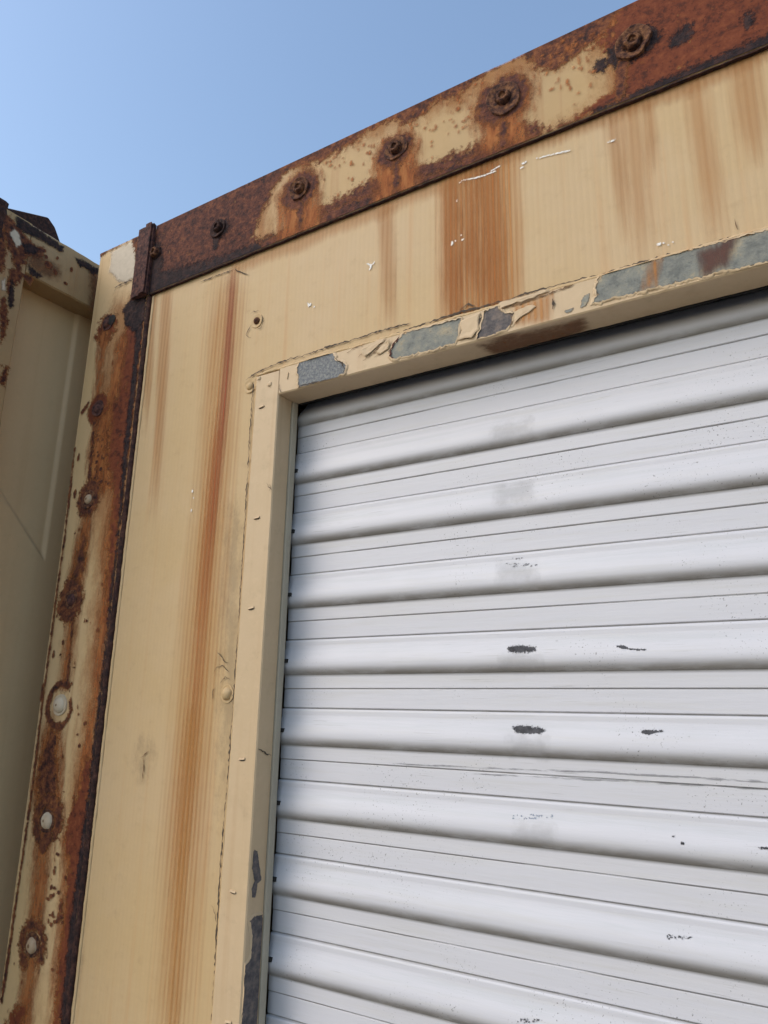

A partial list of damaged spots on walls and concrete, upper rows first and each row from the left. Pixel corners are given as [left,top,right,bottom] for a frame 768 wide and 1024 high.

rust [149,0,768,317]
rust [0,215,138,343]
peeling [109,241,136,292]
peeling [296,228,768,388]
rust [0,295,147,1024]
rust [177,291,234,879]
peeling [252,850,261,898]
peeling [241,911,263,1024]